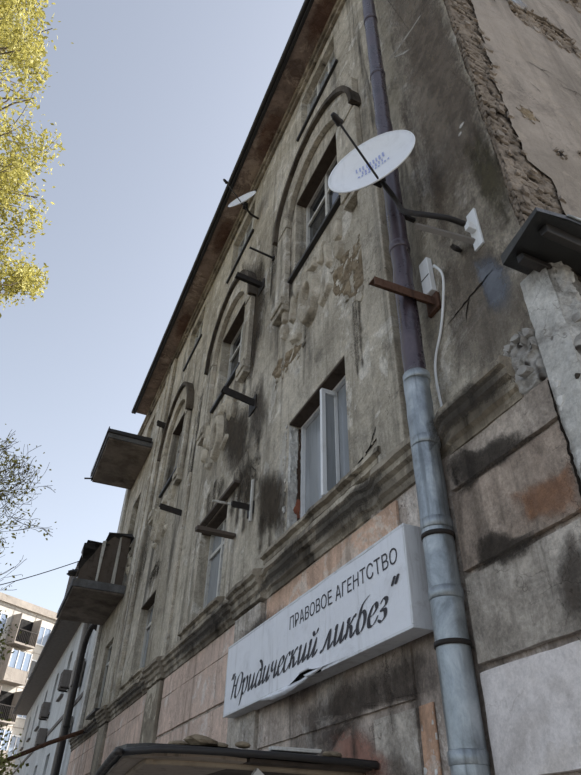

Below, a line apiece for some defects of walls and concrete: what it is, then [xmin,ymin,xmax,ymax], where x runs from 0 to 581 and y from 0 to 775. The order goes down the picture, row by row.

spalling [507,0,581,59]
spalling [443,0,567,228]
spalling [553,147,581,160]
damp [204,85,361,549]
spalling [272,334,307,392]
spalling [329,234,364,304]
damp [352,301,363,376]
crack [446,271,492,327]
crack [547,379,581,497]
damp [558,540,581,619]